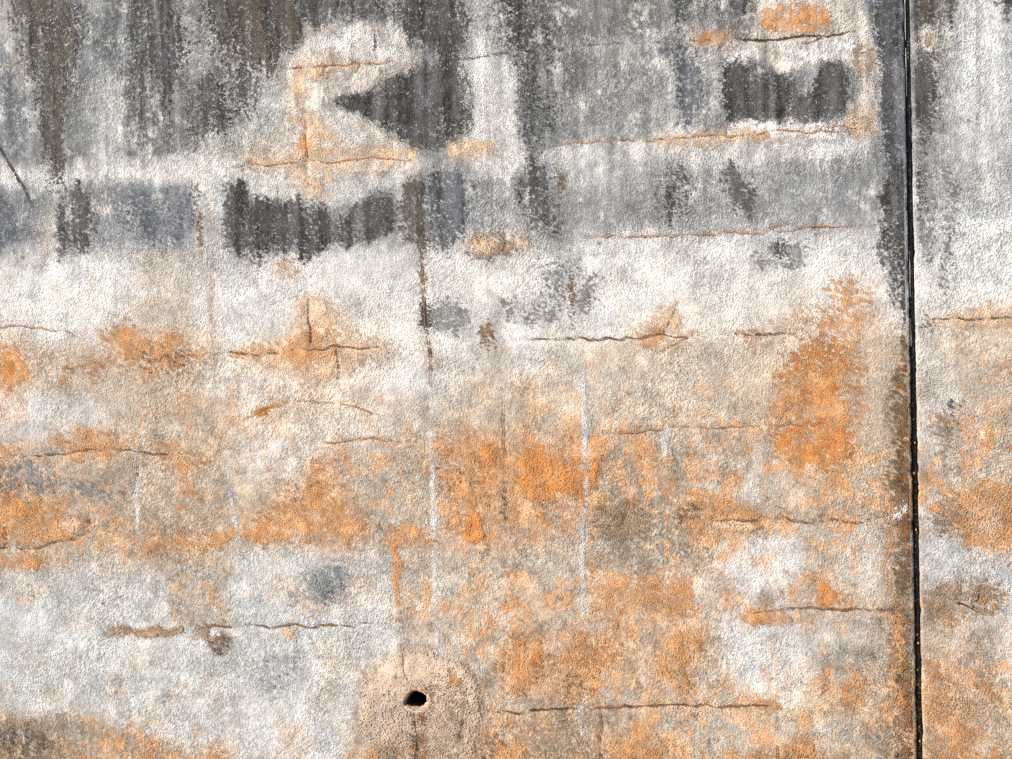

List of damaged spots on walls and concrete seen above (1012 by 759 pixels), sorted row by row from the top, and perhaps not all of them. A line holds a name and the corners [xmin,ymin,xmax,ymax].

crack [0,148,32,207]
water stain [7,0,98,262]
water stain [116,0,566,351]
water stain [718,57,849,124]
water stain [865,0,905,327]
crack [215,302,401,444]
rust [229,293,392,387]
rust [735,276,872,479]
crack [102,608,372,645]
rust [431,432,729,759]
rust [879,328,912,759]
crack [486,703,778,759]